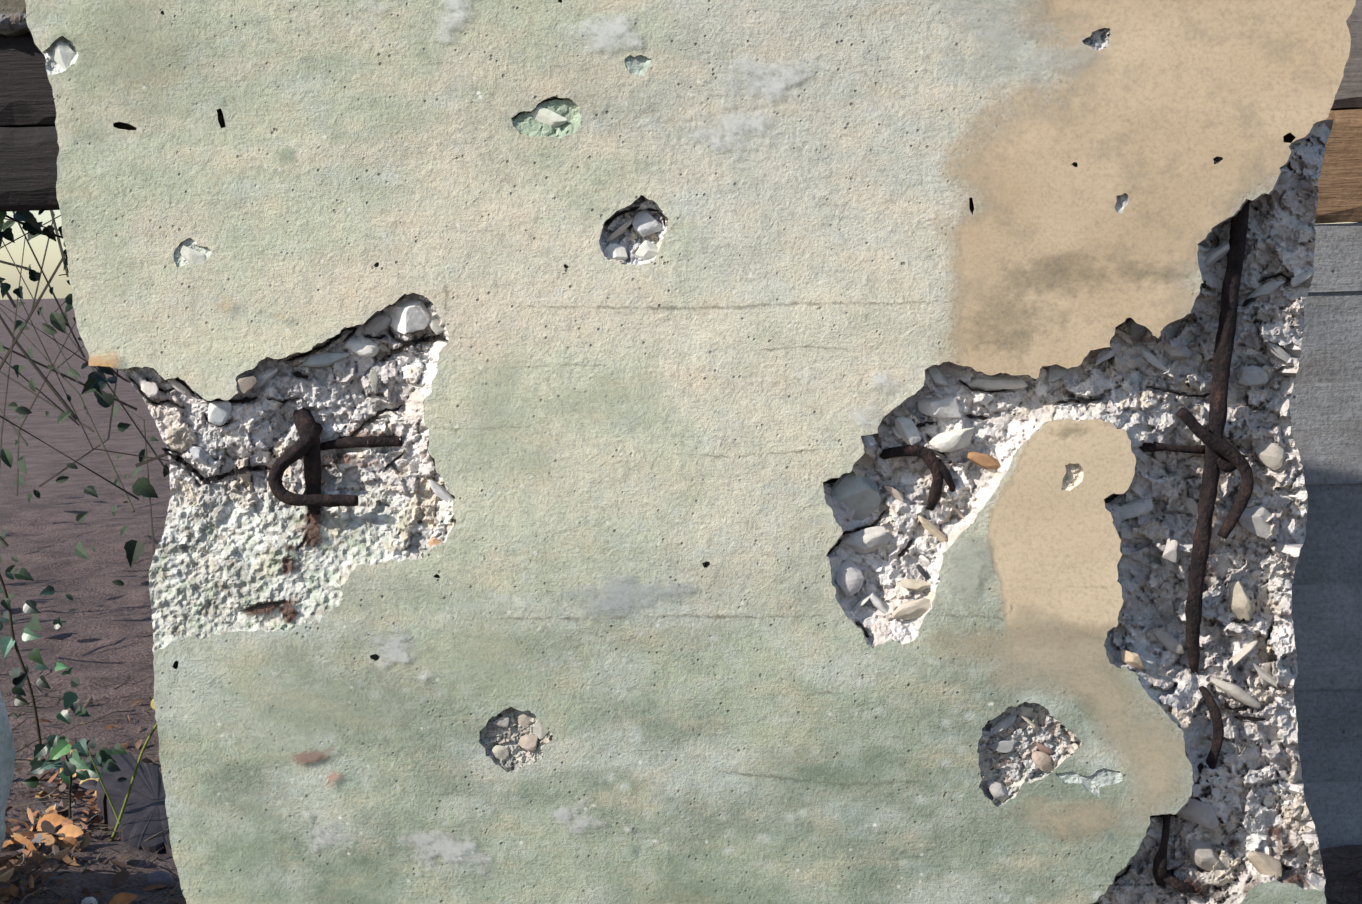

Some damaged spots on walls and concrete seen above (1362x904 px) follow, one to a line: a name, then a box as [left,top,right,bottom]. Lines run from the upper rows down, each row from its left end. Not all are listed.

peeling [512,96,582,139]
spalling [599,195,668,265]
damp [950,0,1356,379]
spalling [114,293,456,652]
spalling [479,707,554,773]
damp [948,418,1185,809]
spalling [824,119,1334,904]